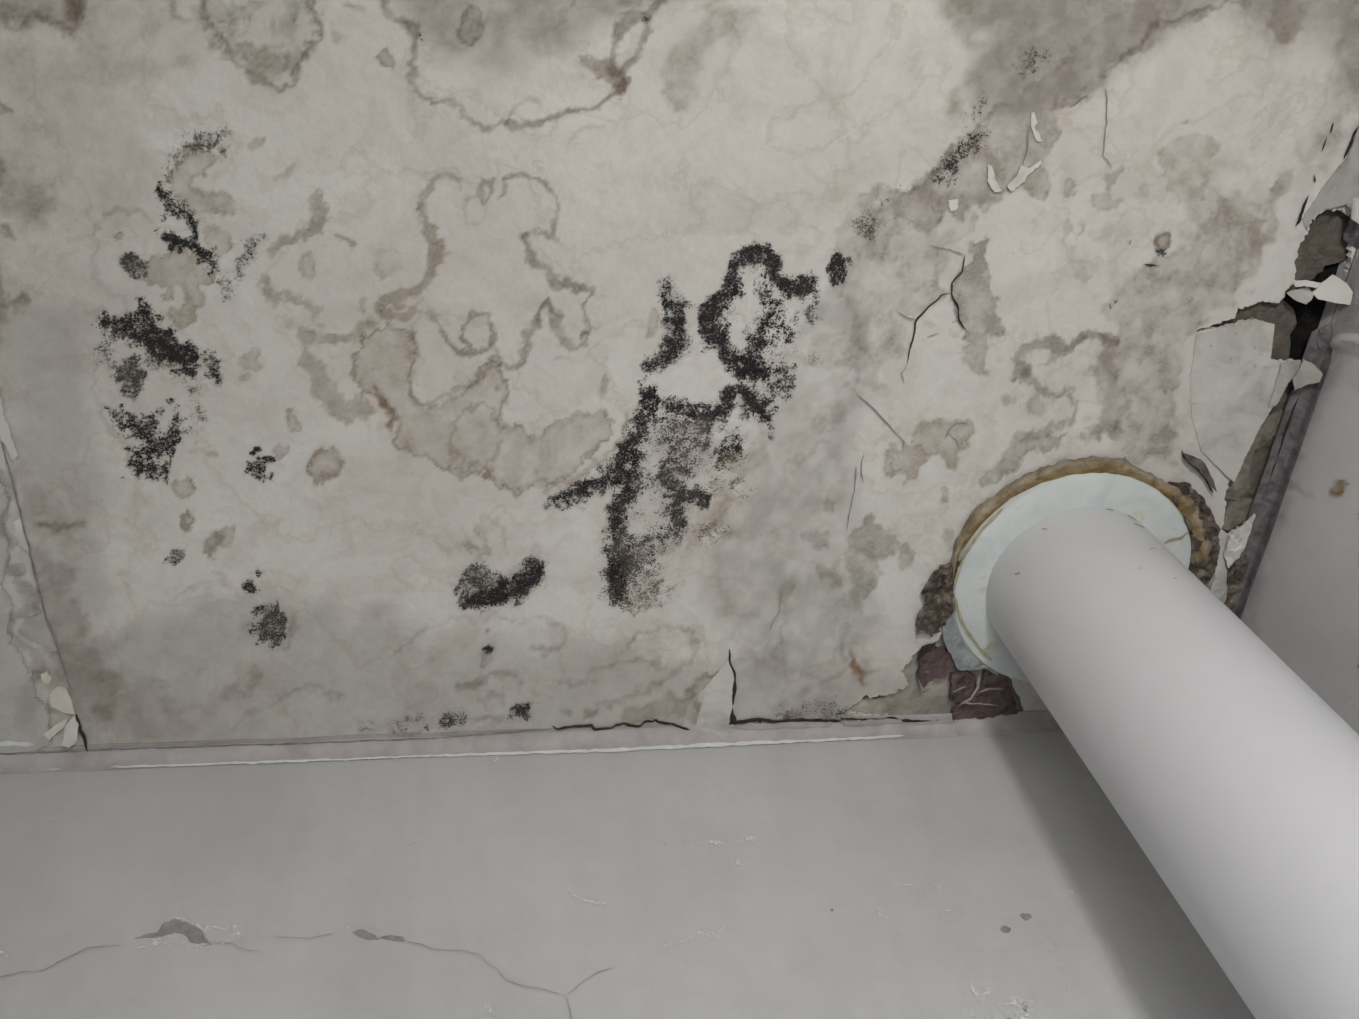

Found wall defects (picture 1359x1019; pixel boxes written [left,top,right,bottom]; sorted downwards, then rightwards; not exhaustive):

peeling [0,394,19,461]
water stain [95,127,265,483]
water stain [244,446,277,485]
water stain [544,189,889,609]
crack [856,393,907,448]
crack [898,204,966,381]
peeling [1168,127,1359,611]
peeling [0,670,79,748]
crack [0,439,689,755]
water stain [453,554,545,615]
spalling [112,560,1023,768]
crack [729,716,929,725]